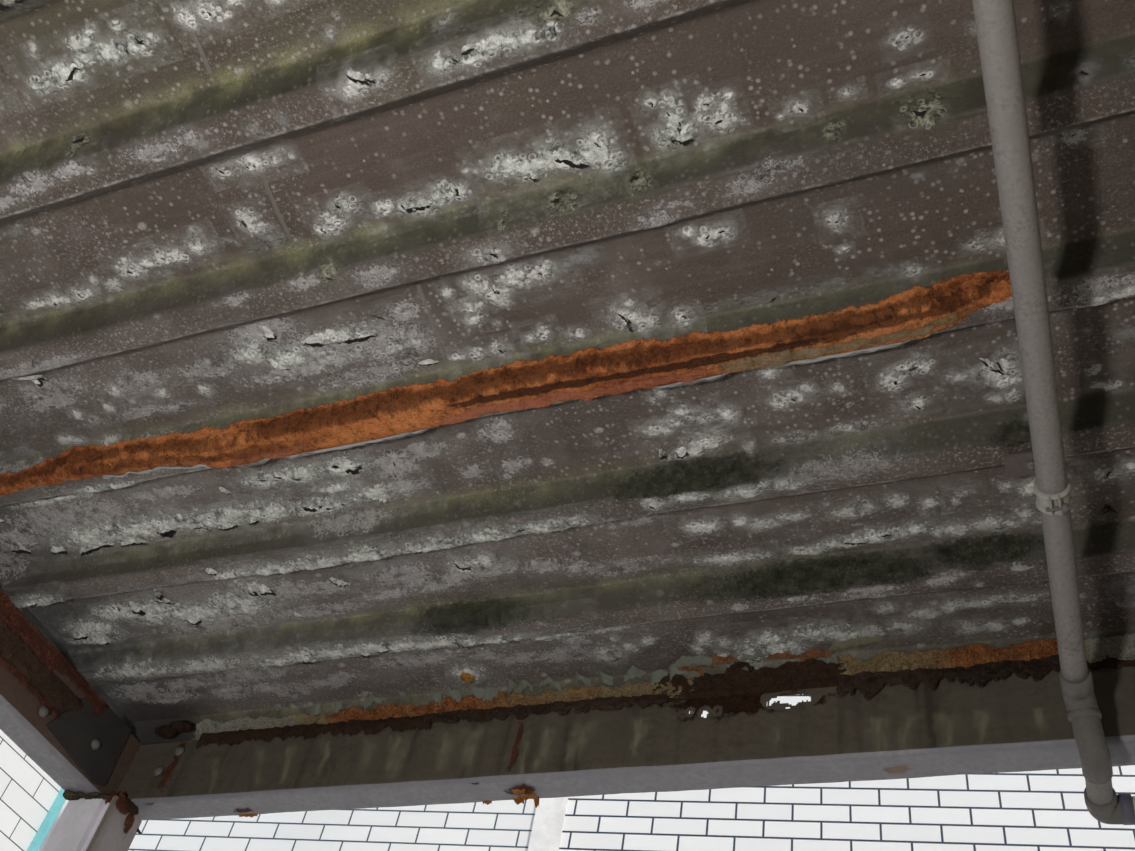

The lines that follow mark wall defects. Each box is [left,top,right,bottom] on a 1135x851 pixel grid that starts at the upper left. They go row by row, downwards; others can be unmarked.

rust [968,231,1005,250]
rust [441,245,557,326]
rust [0,263,1061,787]
peeling [576,635,884,686]
rust [1084,633,1135,671]
rust [105,791,153,834]
rust [504,784,539,808]